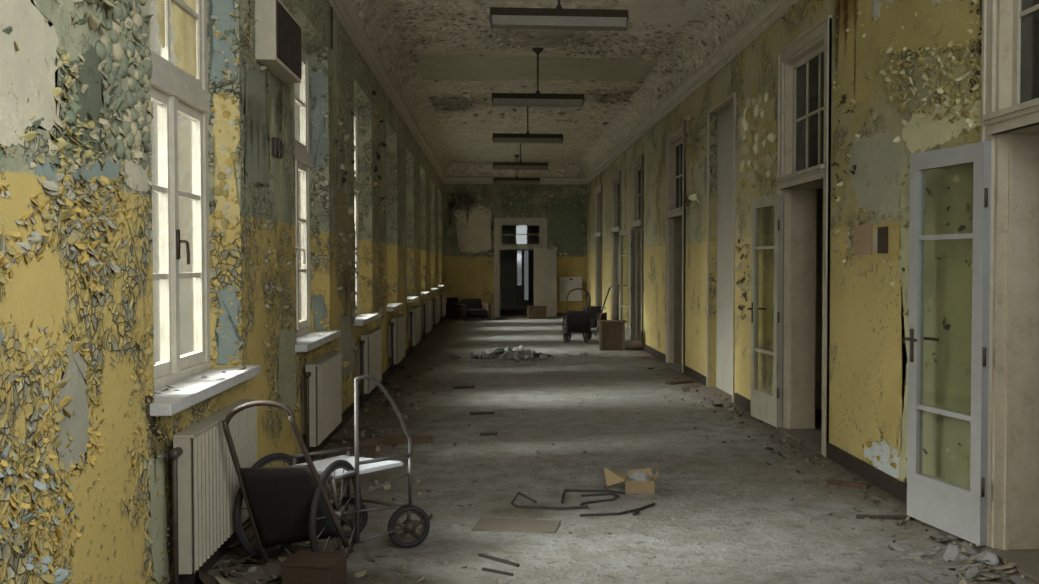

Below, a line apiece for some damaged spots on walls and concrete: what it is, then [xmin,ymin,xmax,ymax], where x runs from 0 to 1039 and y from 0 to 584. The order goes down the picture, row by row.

flaking render [609,0,708,39]
flaking render [0,0,155,307]
flaking render [214,284,243,366]